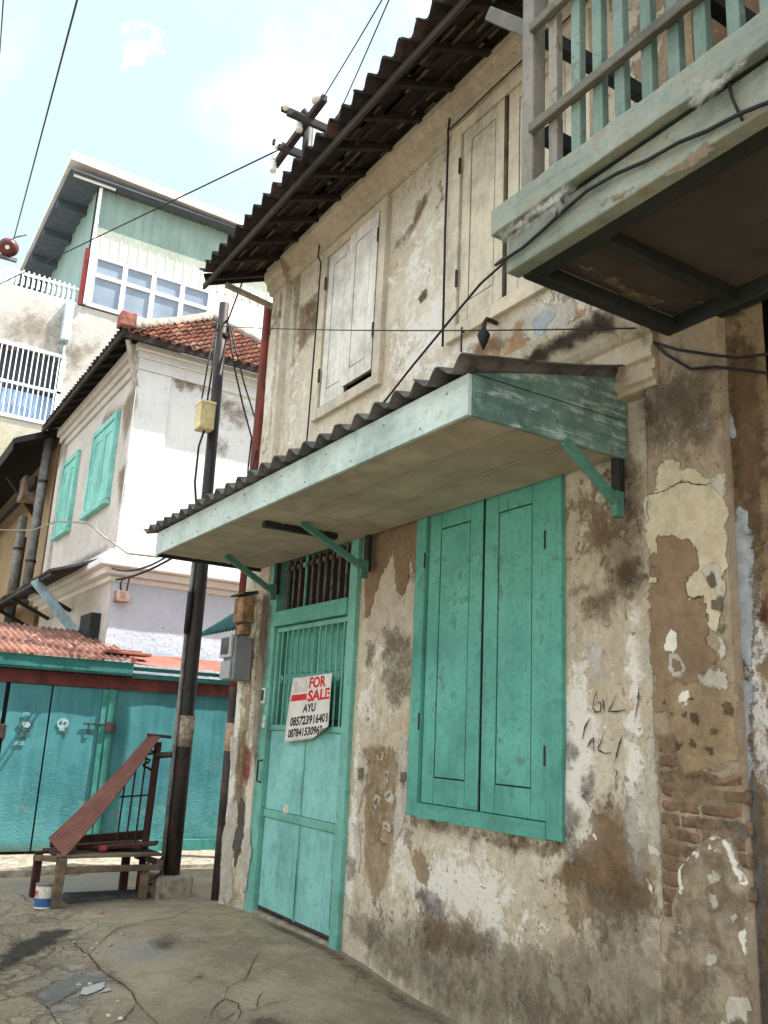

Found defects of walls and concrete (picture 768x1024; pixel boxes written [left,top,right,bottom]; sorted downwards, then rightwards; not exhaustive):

peeling [690,63,744,104]
leakage [526,311,614,361]
crack [645,477,717,521]
flaking render [364,520,417,619]
peeling [230,736,242,777]
peeling [626,458,762,969]
peeling [220,794,252,905]
flaking render [352,732,408,896]
leakage [411,848,443,947]
leakage [592,798,649,914]